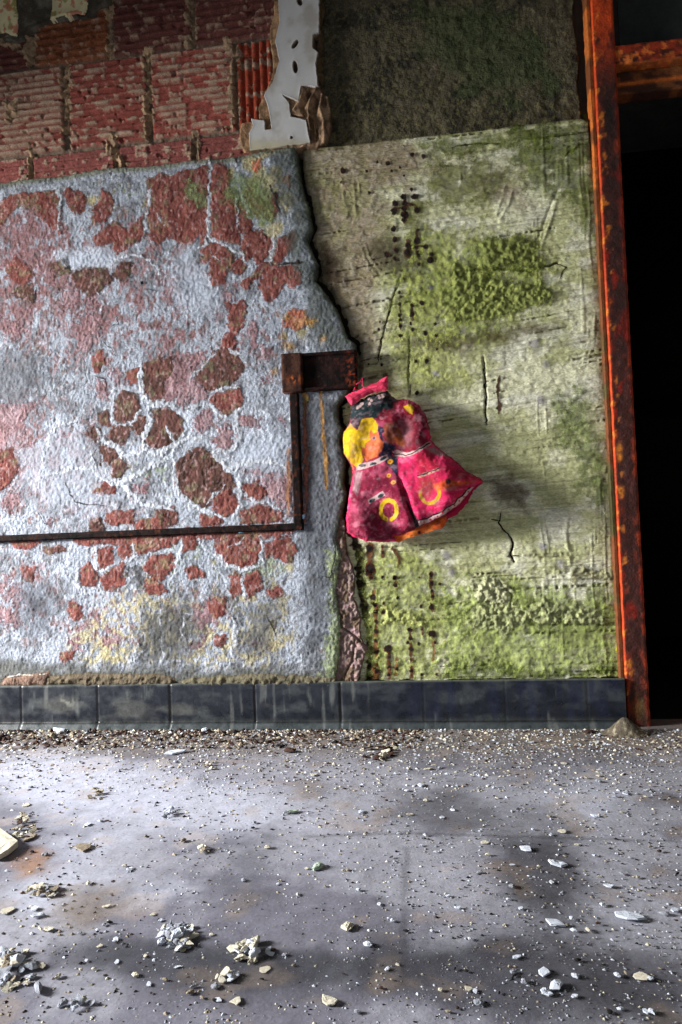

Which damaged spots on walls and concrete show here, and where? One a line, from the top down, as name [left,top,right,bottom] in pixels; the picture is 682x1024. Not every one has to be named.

flaking render [290,0,333,155]
peeling [0,161,306,653]
peeling [282,308,312,331]
rust [286,391,329,523]
crack [278,172,400,362]
leakage [371,120,595,402]
crack [483,360,502,425]
flaking render [0,515,368,687]
crack [318,390,413,681]
rust [365,542,441,680]
leakage [361,546,618,680]
crack [491,513,519,585]